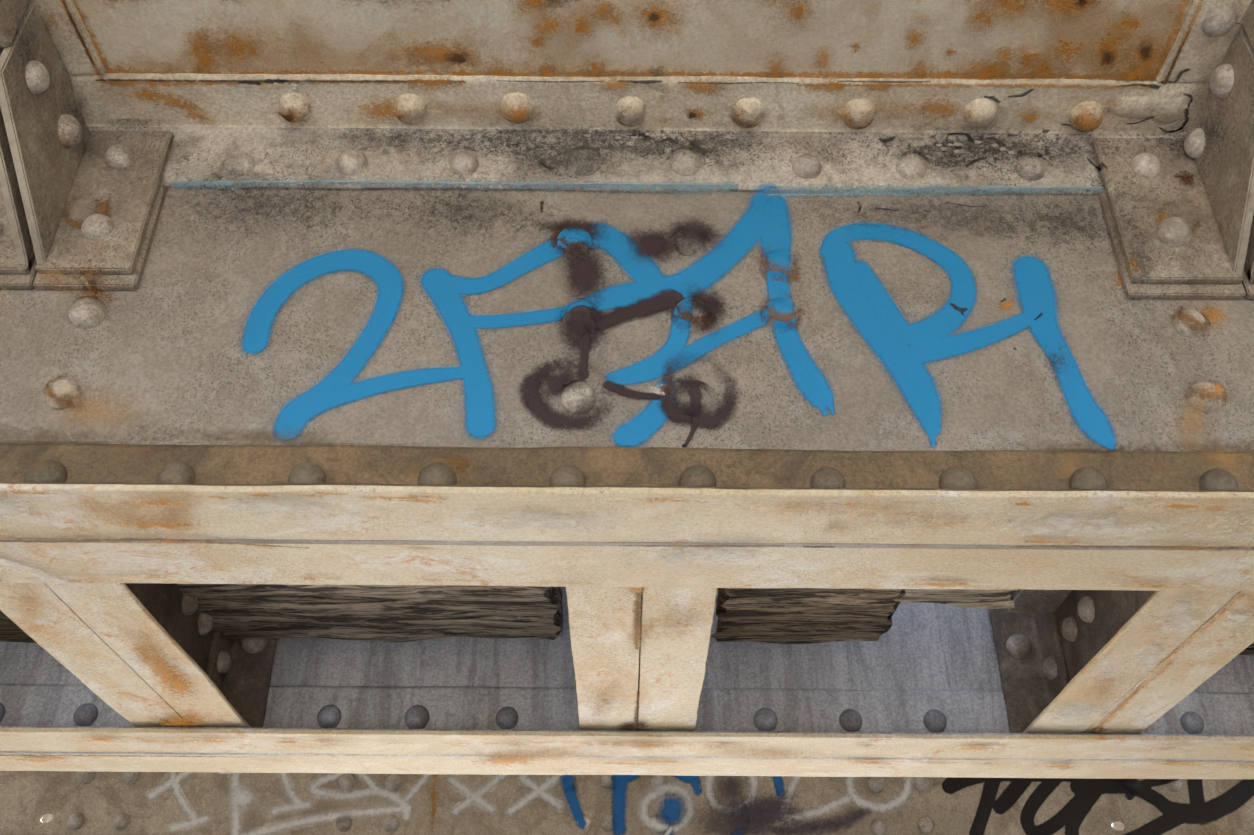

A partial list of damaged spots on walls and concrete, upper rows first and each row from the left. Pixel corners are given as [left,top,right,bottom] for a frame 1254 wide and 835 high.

corrosion [59,0,1203,123]
corrosion [359,100,412,125]
corrosion [1070,105,1103,132]
corrosion [0,499,303,548]
corrosion [1009,540,1254,549]